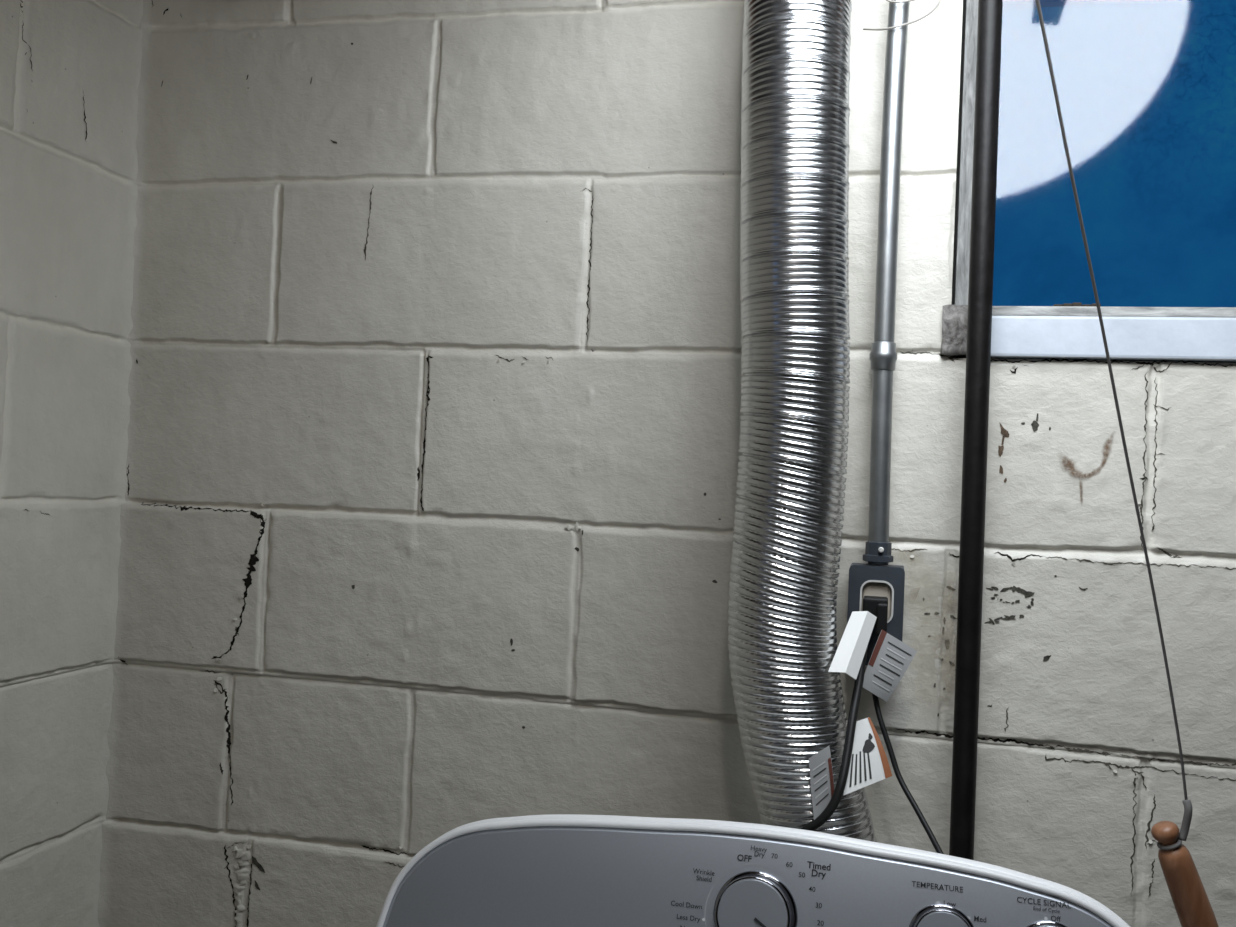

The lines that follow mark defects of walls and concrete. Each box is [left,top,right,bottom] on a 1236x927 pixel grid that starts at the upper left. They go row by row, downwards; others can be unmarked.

crack [364,188,373,259]
crack [584,188,595,352]
crack [417,355,433,511]
crack [900,350,960,363]
crack [991,358,1236,570]
crack [892,548,959,558]
crack [127,466,267,805]
crack [224,842,252,927]
crack [897,729,1236,896]